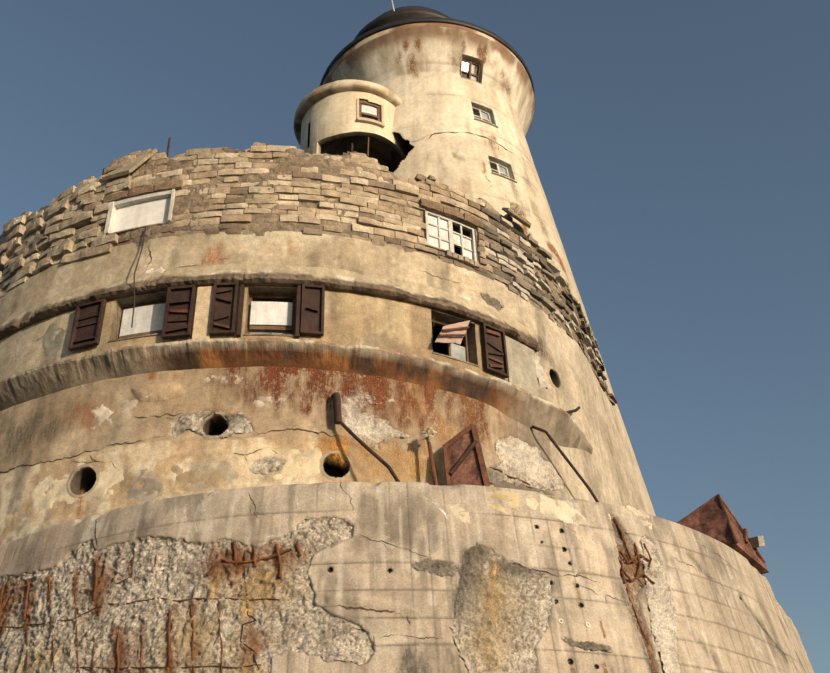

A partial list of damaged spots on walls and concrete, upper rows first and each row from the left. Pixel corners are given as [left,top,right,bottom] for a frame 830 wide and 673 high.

corrosion [397,39,420,76]
crack [413,132,529,164]
crack [0,413,183,473]
crack [225,428,342,460]
corrosion [250,366,488,443]
spalling [337,389,410,450]
spalling [486,435,593,533]
corrosion [93,557,105,617]
spalling [0,517,374,673]
corrosion [240,562,281,621]
crack [510,563,626,603]
spalling [608,505,681,673]